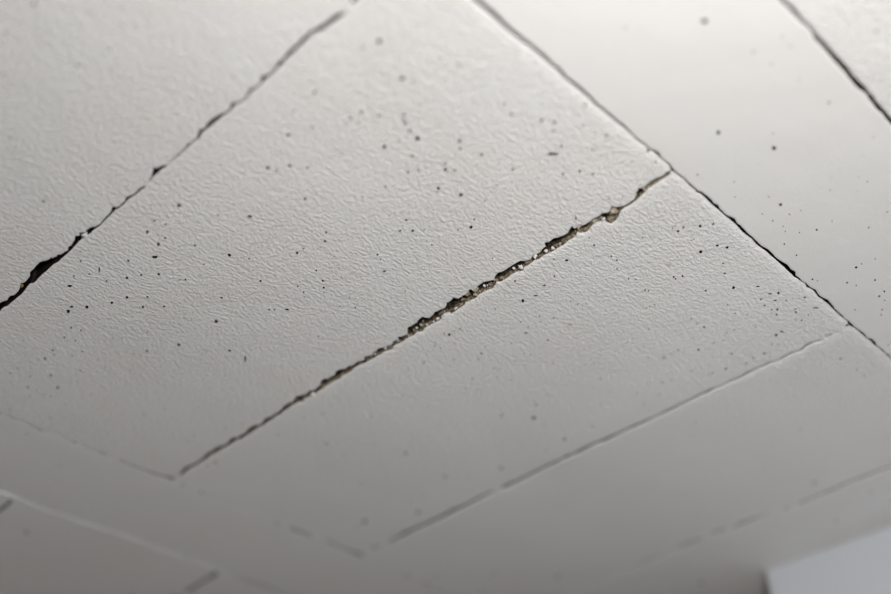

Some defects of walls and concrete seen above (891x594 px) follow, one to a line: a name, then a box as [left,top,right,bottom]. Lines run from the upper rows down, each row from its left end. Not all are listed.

crack [0,0,356,310]
crack [180,0,891,548]